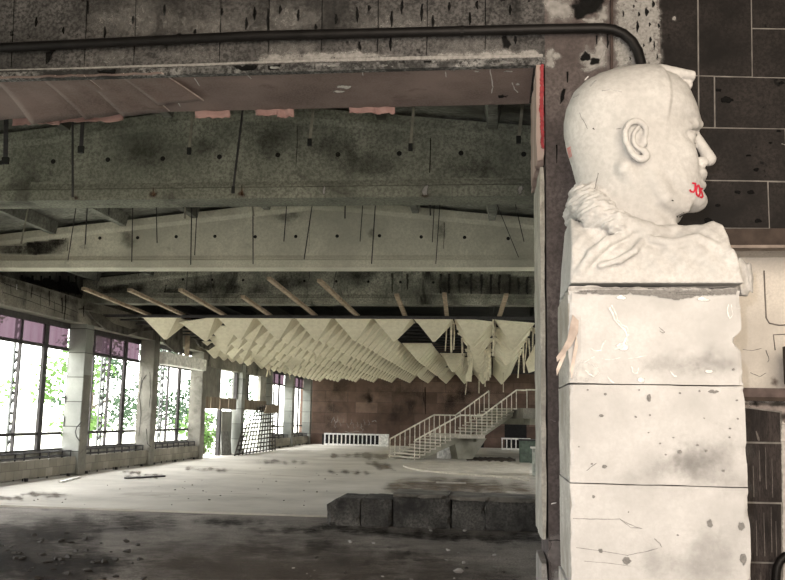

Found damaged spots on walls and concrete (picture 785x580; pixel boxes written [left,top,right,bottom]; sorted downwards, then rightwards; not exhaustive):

peeling [544,0,572,19]
peeling [583,6,607,23]
peeling [616,0,662,65]
peeling [546,49,560,67]
peeling [583,37,636,71]
crack [576,519,662,566]